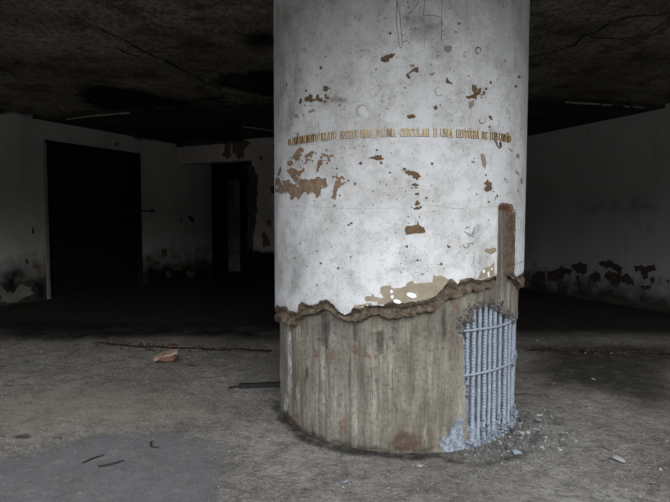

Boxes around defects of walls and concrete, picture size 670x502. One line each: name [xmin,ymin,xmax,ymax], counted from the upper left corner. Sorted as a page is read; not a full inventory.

crack [100,28,222,92]
peeling [380,53,396,63]
crack [529,14,666,57]
peeling [290,86,330,136]
peeling [465,75,492,110]
peeling [270,146,356,207]
spalling [274,153,669,452]